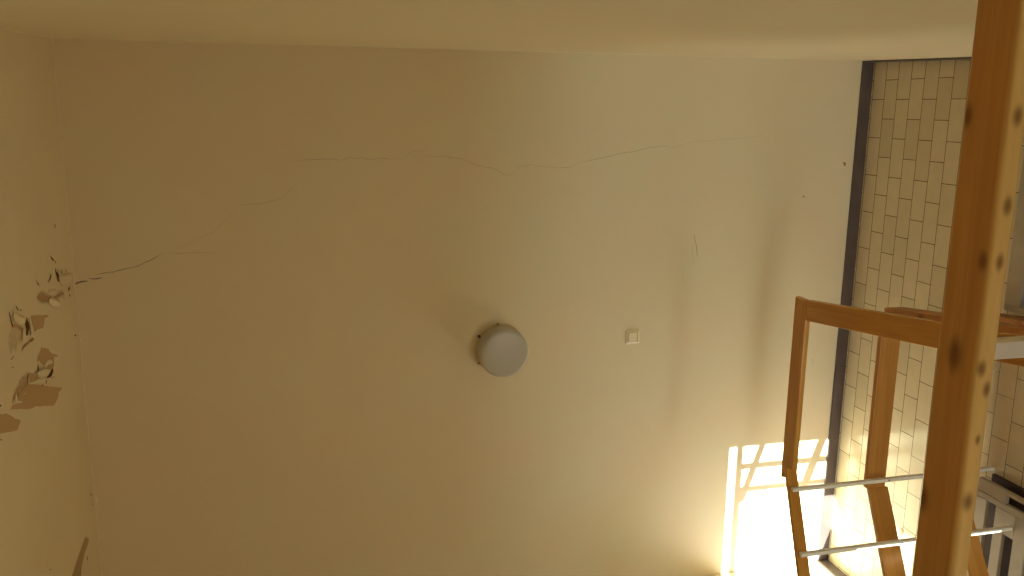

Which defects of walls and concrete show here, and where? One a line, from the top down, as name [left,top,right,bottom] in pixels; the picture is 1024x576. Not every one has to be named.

peeling [0,256,72,441]